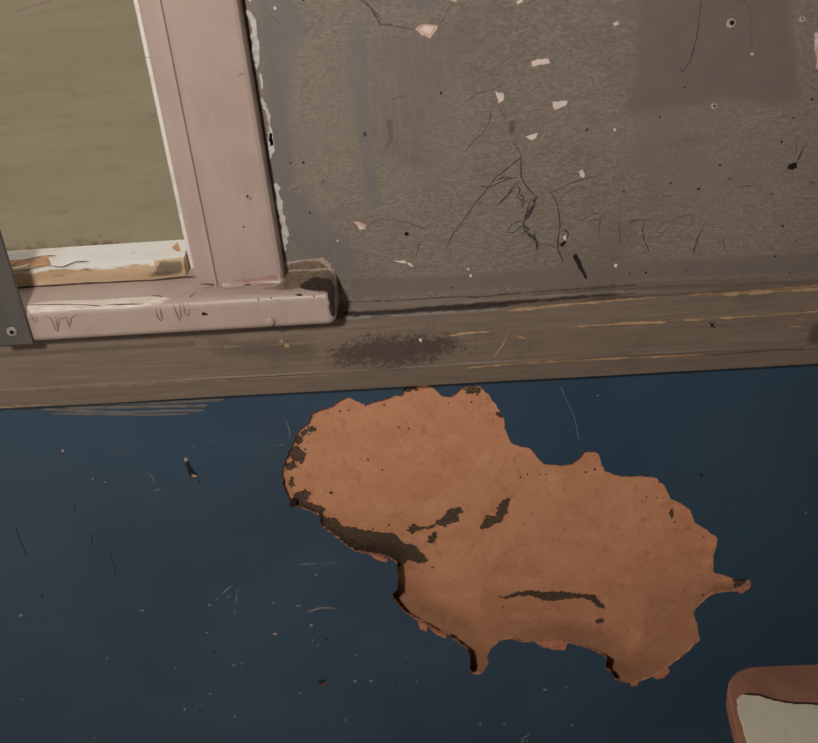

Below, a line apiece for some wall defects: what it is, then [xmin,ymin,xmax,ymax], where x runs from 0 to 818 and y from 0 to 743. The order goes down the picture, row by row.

crack [361,0,412,29]
peeling [282,385,751,686]